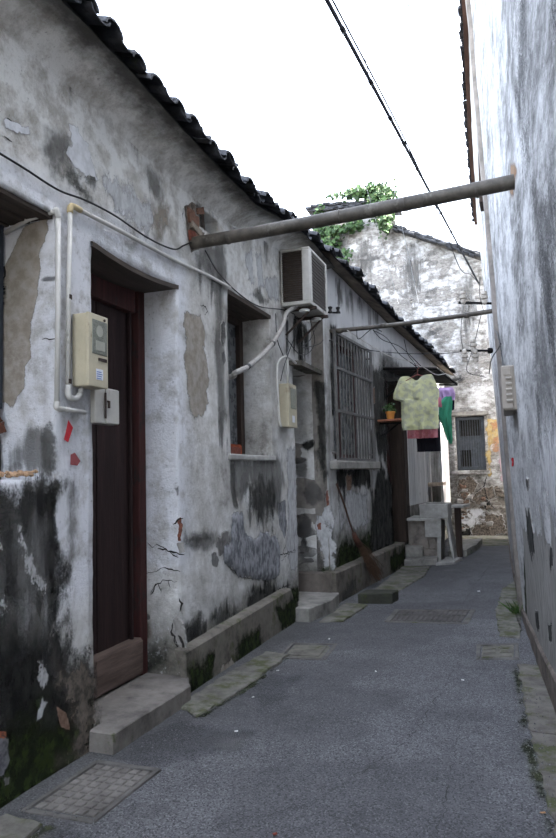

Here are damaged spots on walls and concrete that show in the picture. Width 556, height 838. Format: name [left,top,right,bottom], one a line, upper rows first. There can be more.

peeling [4,118,30,142]
water stain [44,135,96,203]
spalling [184,202,205,252]
peeling [3,219,48,407]
peeling [315,474,369,570]
spalling [456,475,508,536]
peeling [522,400,556,674]
water stain [0,422,87,739]
crack [148,543,184,611]
spalling [0,731,10,786]